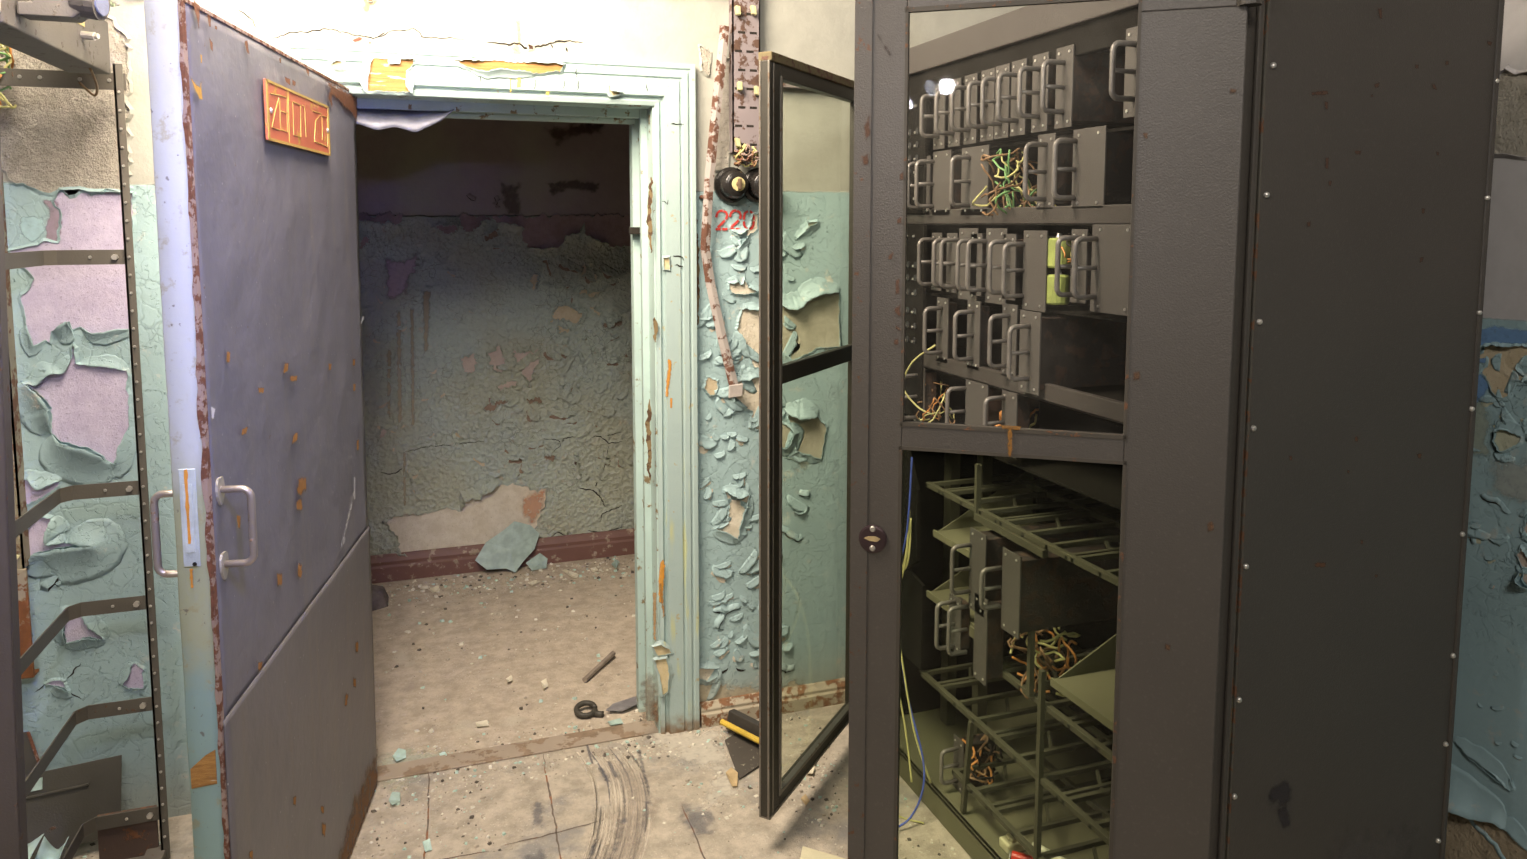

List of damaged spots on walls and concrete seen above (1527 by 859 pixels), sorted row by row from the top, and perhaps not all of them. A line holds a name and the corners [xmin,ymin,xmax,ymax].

crack [238,9,582,90]
peeling [450,43,566,79]
peeling [481,212,631,261]
peeling [783,219,820,258]
spalling [0,15,137,585]
peeling [697,212,759,459]
peeling [782,275,842,364]
peeling [782,392,828,464]
spalling [382,477,548,557]
peeling [698,472,759,701]
peeling [51,605,109,651]
spalling [1445,736,1527,859]